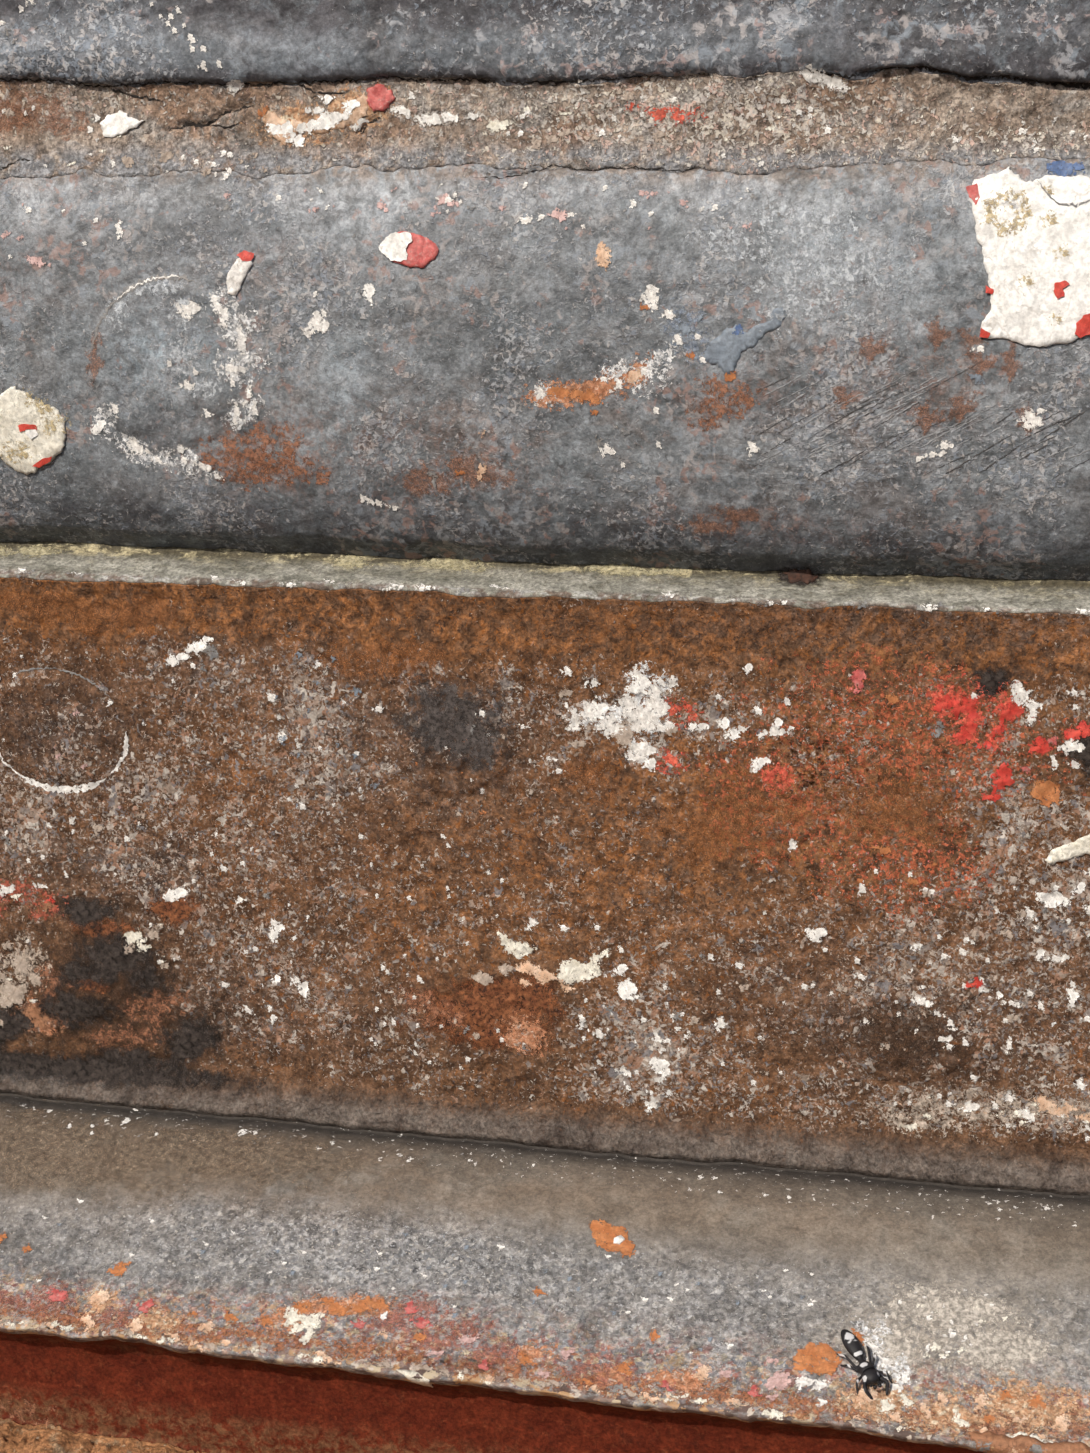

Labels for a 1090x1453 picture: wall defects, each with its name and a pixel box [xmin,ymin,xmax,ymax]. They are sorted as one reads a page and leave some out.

crack [0,71,719,130]
peeling [966,117,1090,353]
peeling [0,386,225,481]
rust [192,417,332,492]
rust [146,894,201,926]
rust [11,997,170,1051]
water stain [0,893,265,1095]
rust [395,969,567,1058]
rust [0,1293,1044,1442]